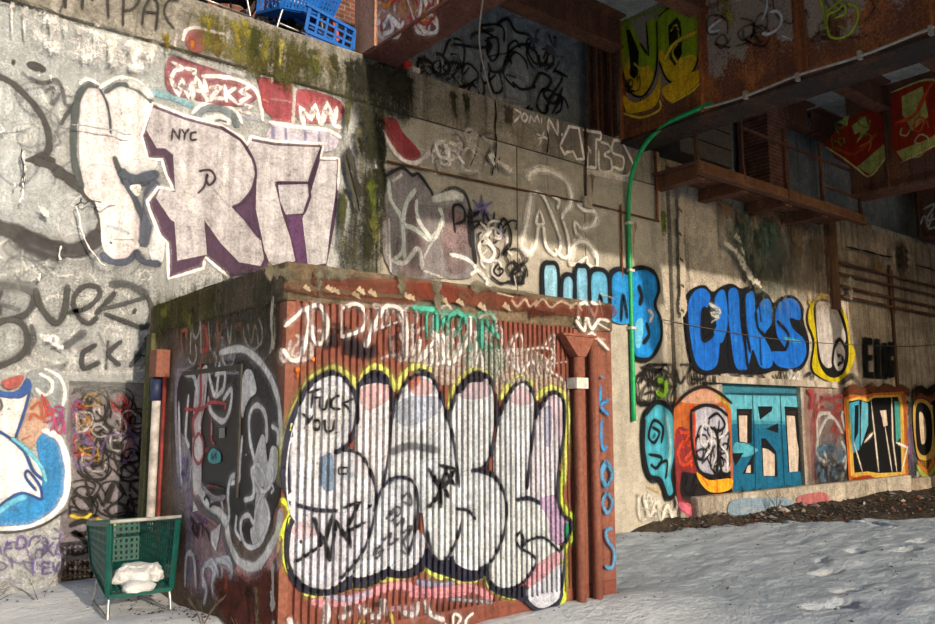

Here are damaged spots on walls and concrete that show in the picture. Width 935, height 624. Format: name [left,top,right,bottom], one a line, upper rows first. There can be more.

water stain [203,17,284,64]
water stain [329,52,418,250]